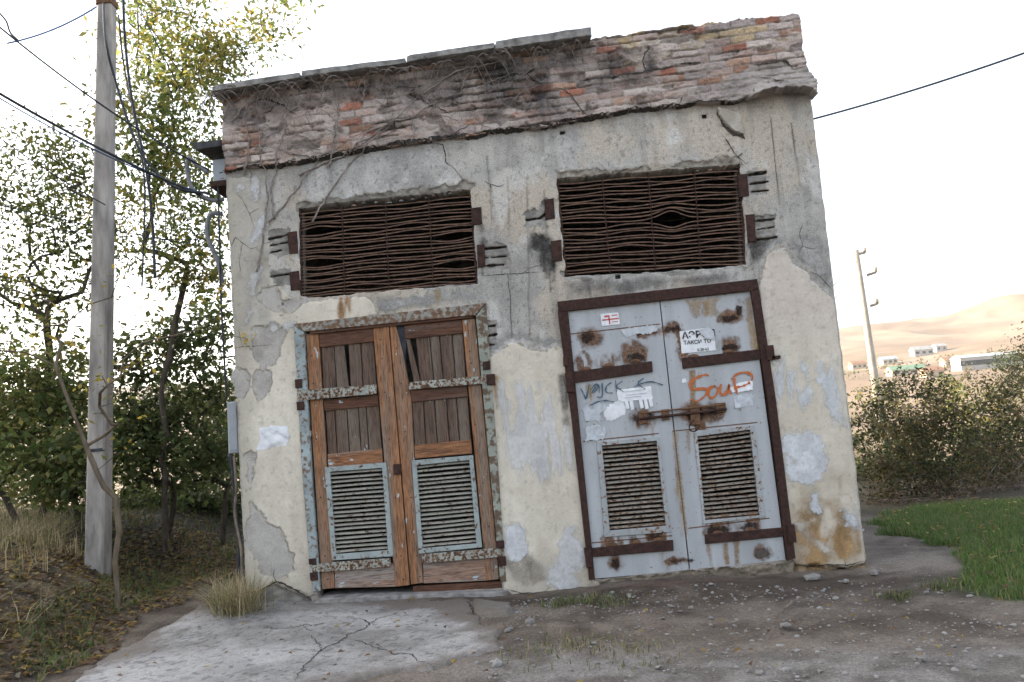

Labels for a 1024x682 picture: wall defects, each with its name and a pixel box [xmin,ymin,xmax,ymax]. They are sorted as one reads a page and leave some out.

crack [219,48,745,270]
peeling [230,214,308,403]
rust [576,321,688,371]
peeling [498,384,572,482]
peeling [782,428,828,514]
peeling [243,450,311,602]
peeling [503,524,528,562]
peeling [546,526,585,590]
rust [600,524,666,570]
leakage [796,507,861,570]
crack [255,572,431,681]